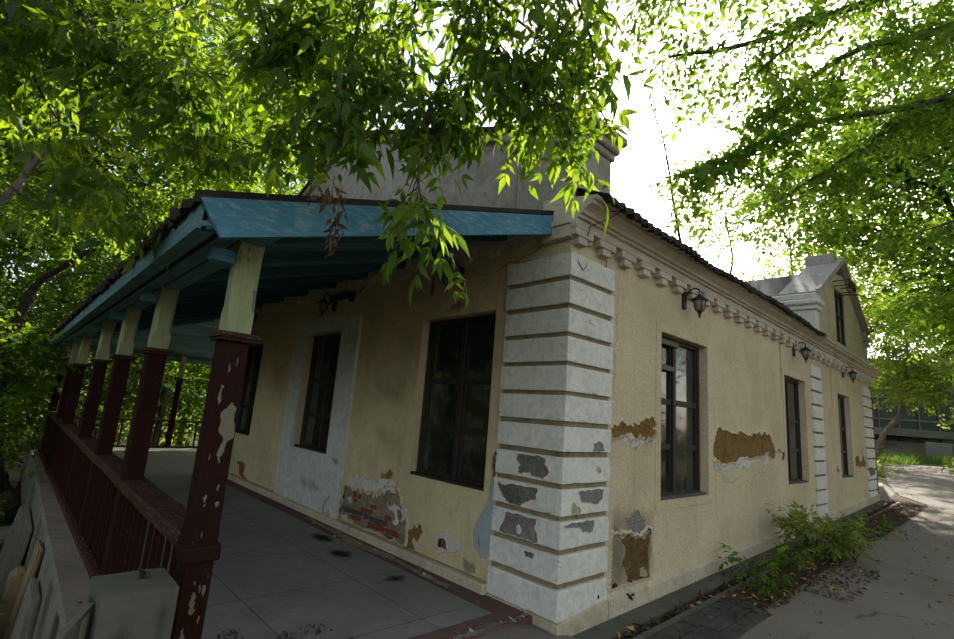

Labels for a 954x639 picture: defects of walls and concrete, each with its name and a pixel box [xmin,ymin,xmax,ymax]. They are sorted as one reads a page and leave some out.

peeling [209,385,237,464]
peeling [593,414,657,452]
peeling [712,424,785,472]
peeling [854,453,875,477]
spalling [321,470,424,551]
peeling [434,450,550,560]
peeling [564,488,605,533]
spalling [607,509,653,592]
peeling [188,581,206,624]